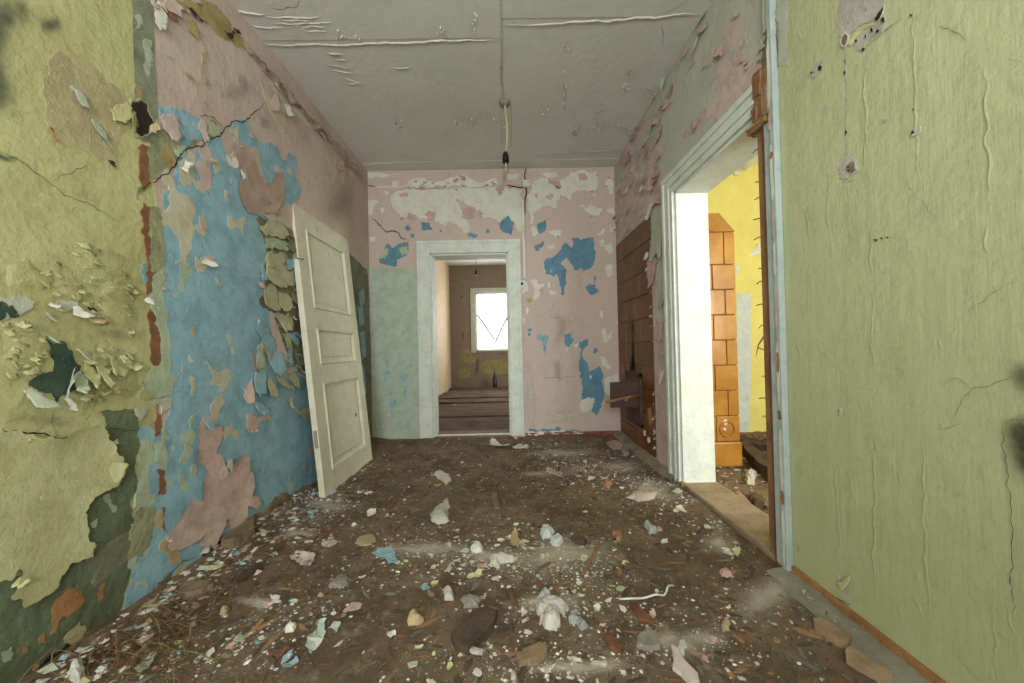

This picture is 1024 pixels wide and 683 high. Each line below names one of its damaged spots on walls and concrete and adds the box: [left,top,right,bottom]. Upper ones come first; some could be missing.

flaking render [837,0,886,52]
crack [5,153,118,221]
crack [139,103,266,192]
flaking render [839,156,859,182]
peeling [0,0,789,683]
crack [938,373,1016,430]
crack [1001,419,1019,613]